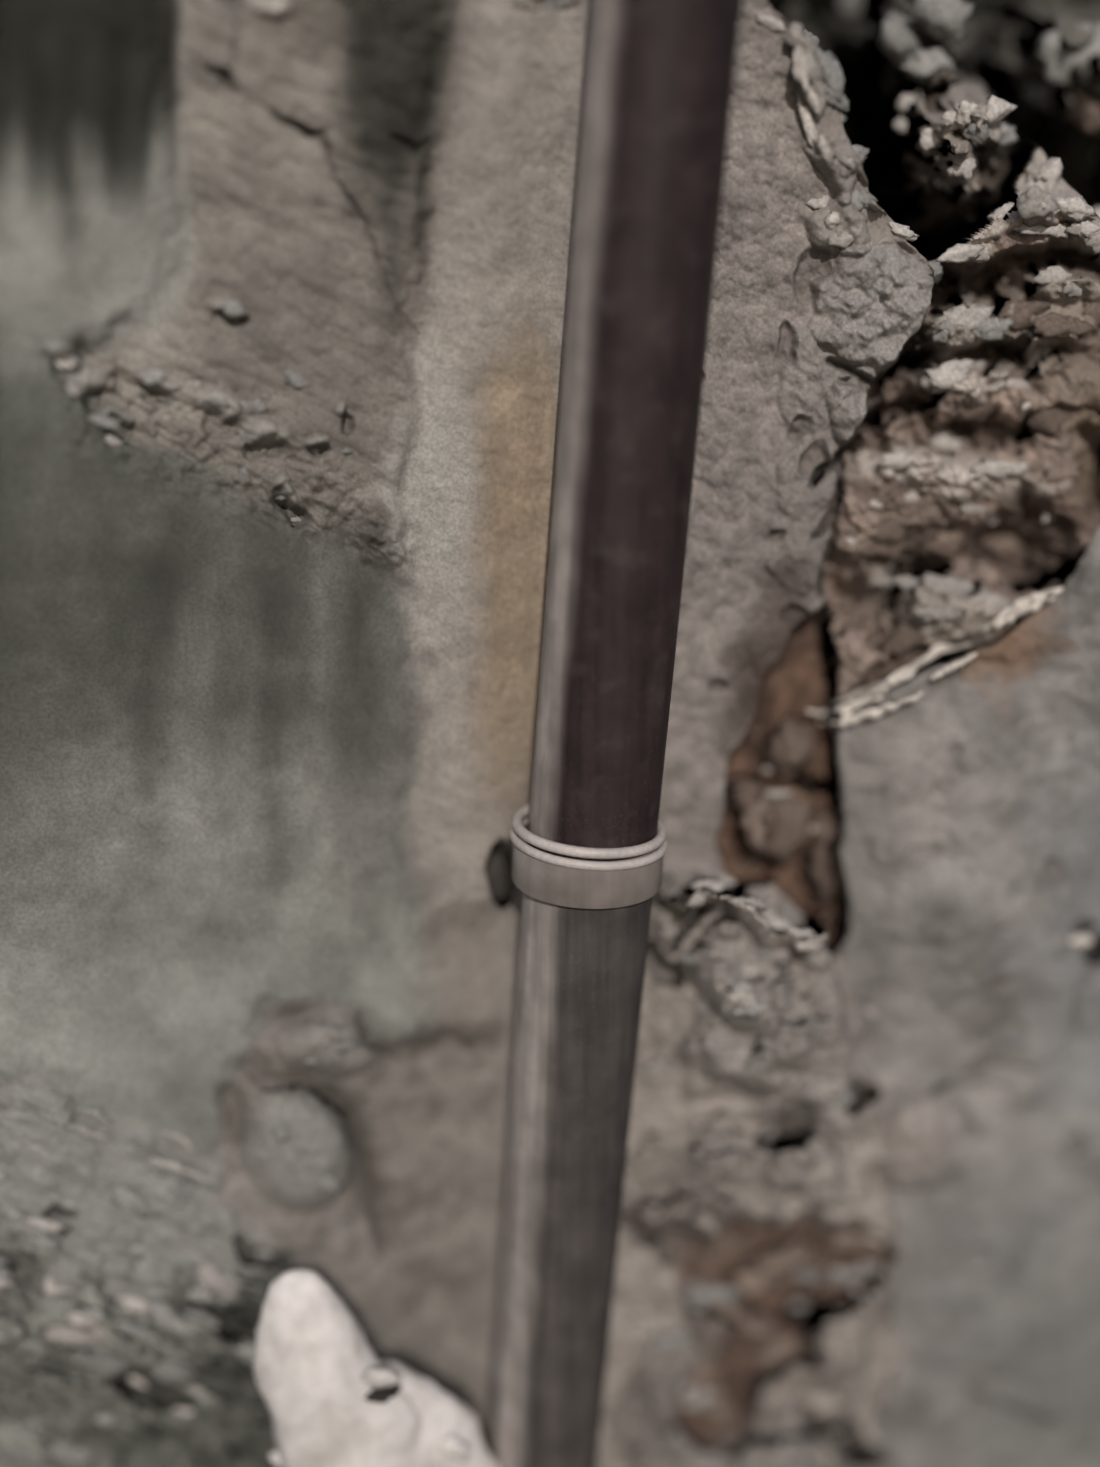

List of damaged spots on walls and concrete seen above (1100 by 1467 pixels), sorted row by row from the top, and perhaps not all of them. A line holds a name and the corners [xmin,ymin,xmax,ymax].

leakage [0,0,177,172]
crack [178,3,422,337]
spalling [221,299,246,316]
spalling [41,344,412,565]
spalling [651,0,1100,1018]
spalling [674,1214,896,1449]